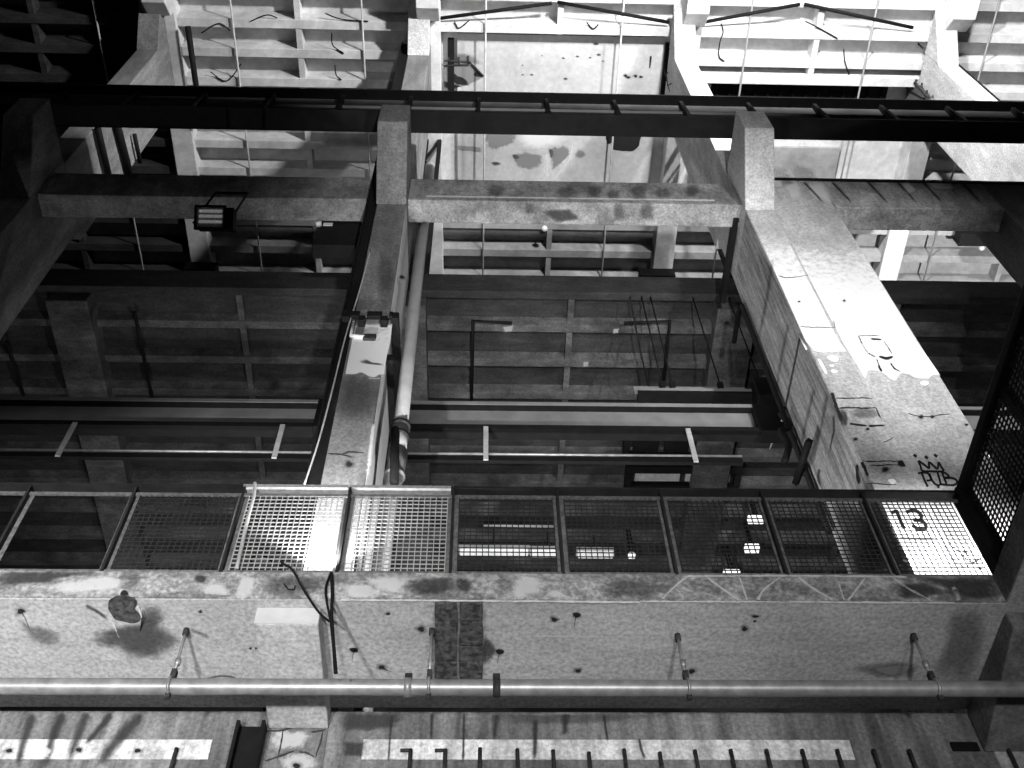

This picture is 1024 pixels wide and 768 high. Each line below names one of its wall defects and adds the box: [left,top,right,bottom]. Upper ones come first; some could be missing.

damp [427,195,715,221]
peeling [762,241,940,386]